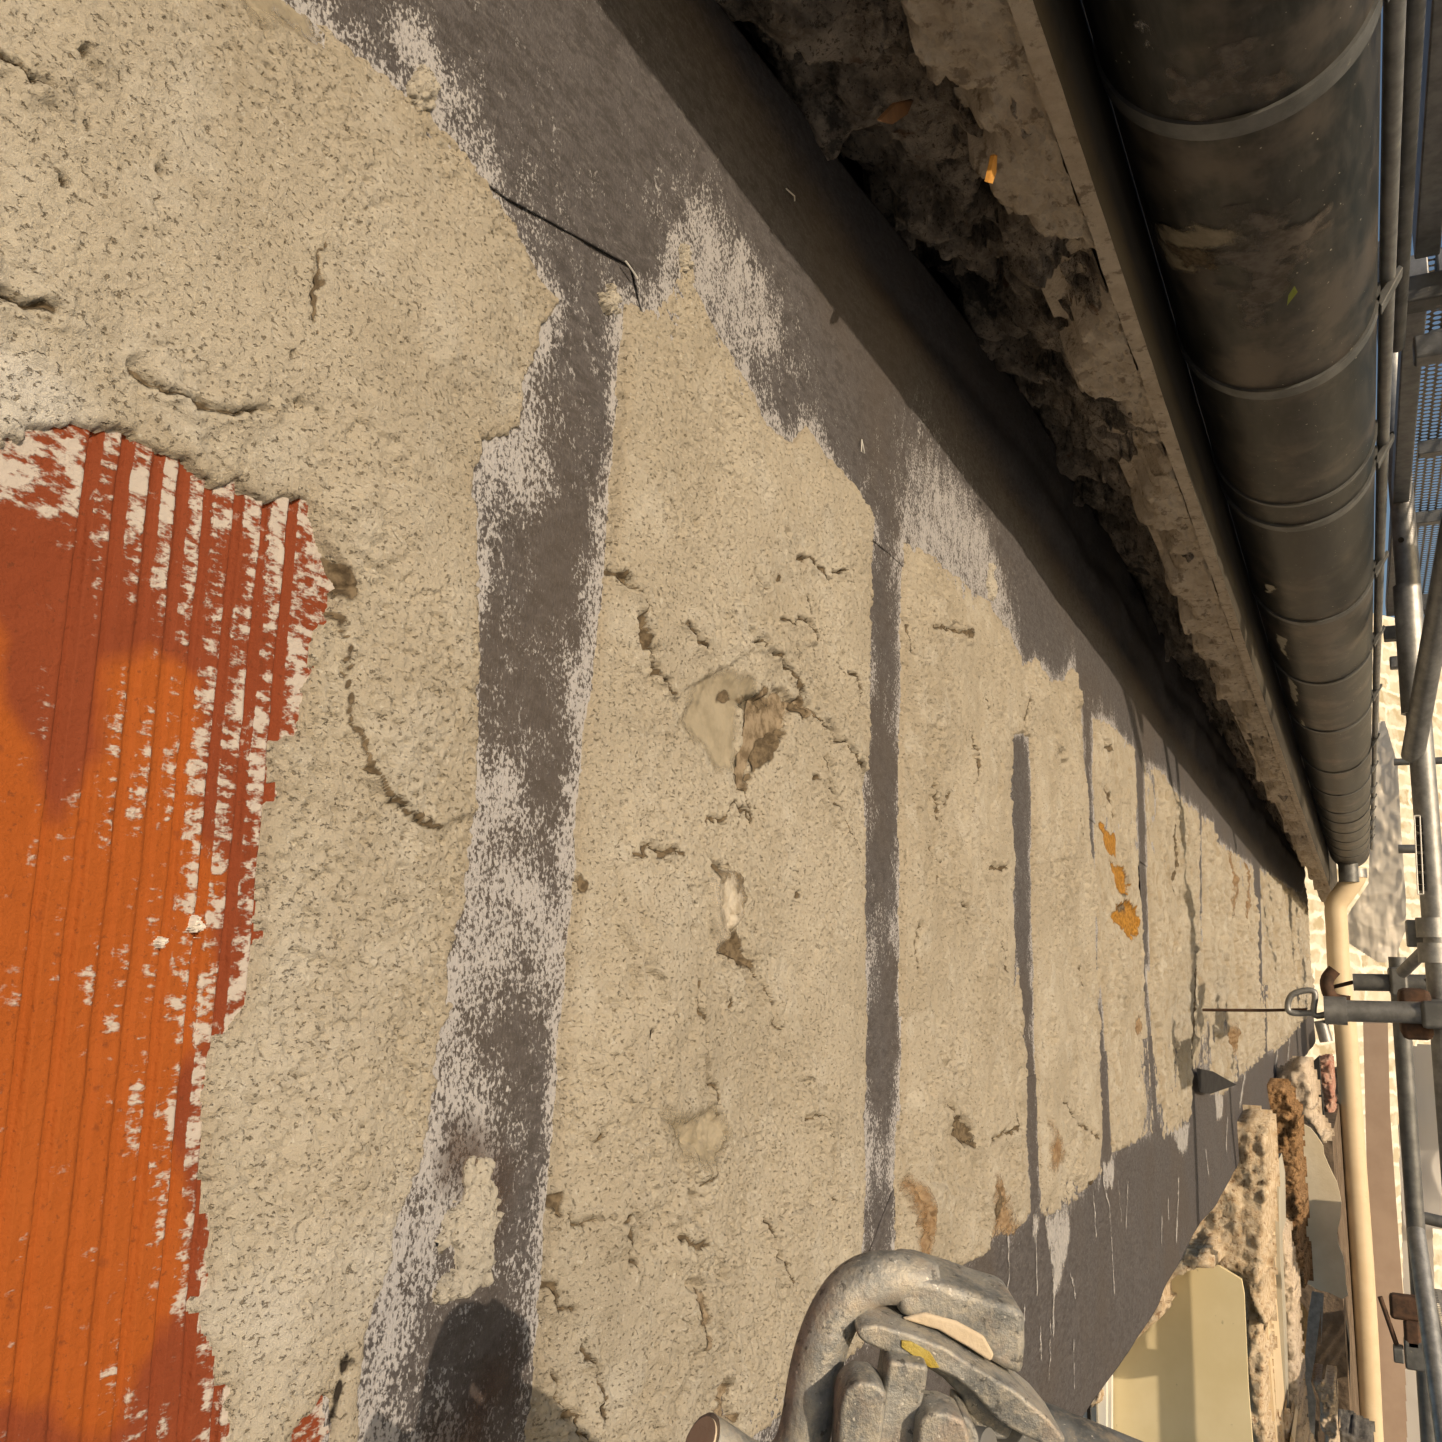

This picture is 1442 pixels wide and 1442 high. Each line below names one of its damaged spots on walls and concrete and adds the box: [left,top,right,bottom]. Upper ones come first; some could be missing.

crack [0,52,45,84]
crack [0,295,56,321]
spalling [716,686,812,789]
spalling [576,875,589,893]
damp [450,1134,484,1167]